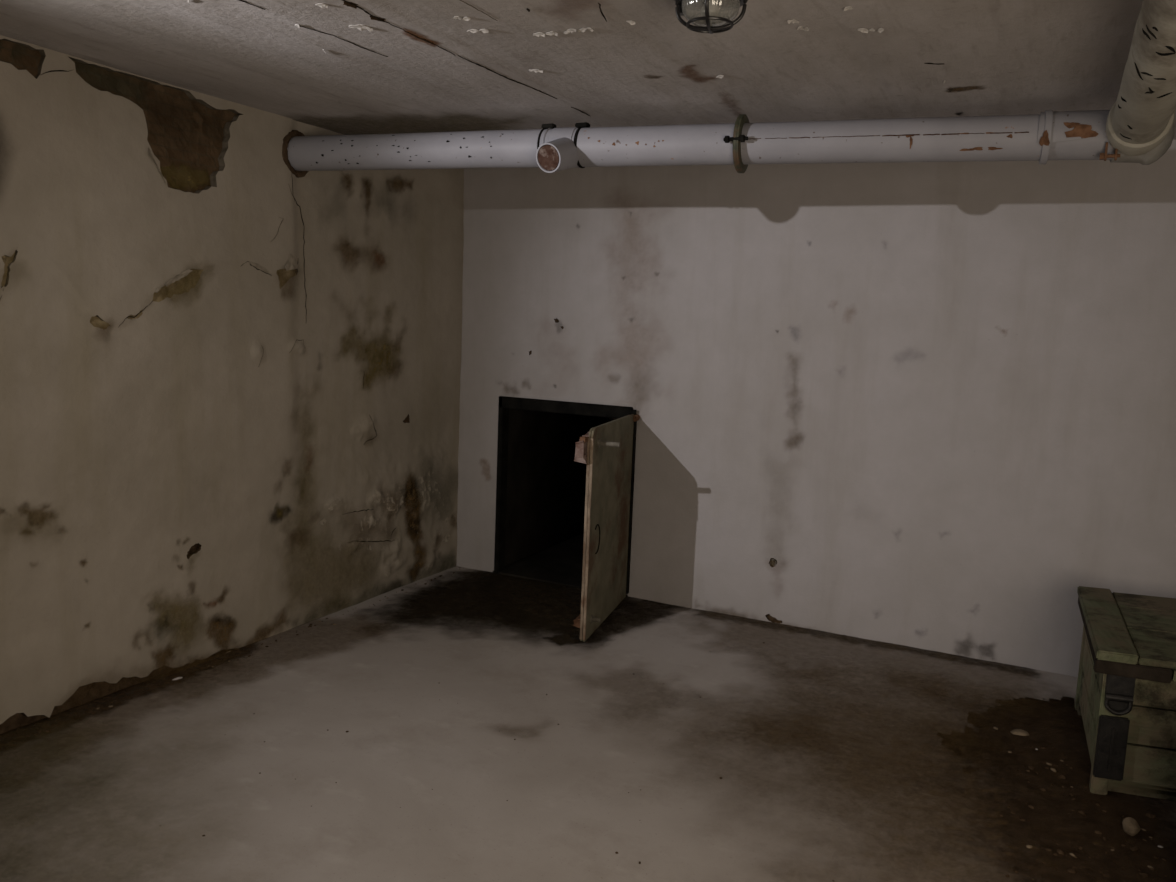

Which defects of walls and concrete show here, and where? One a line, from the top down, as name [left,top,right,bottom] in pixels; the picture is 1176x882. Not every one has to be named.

spalling [0,39,46,79]
spalling [69,57,243,194]
rust [1039,130,1050,146]
rust [1063,122,1098,138]
spalling [0,613,285,734]